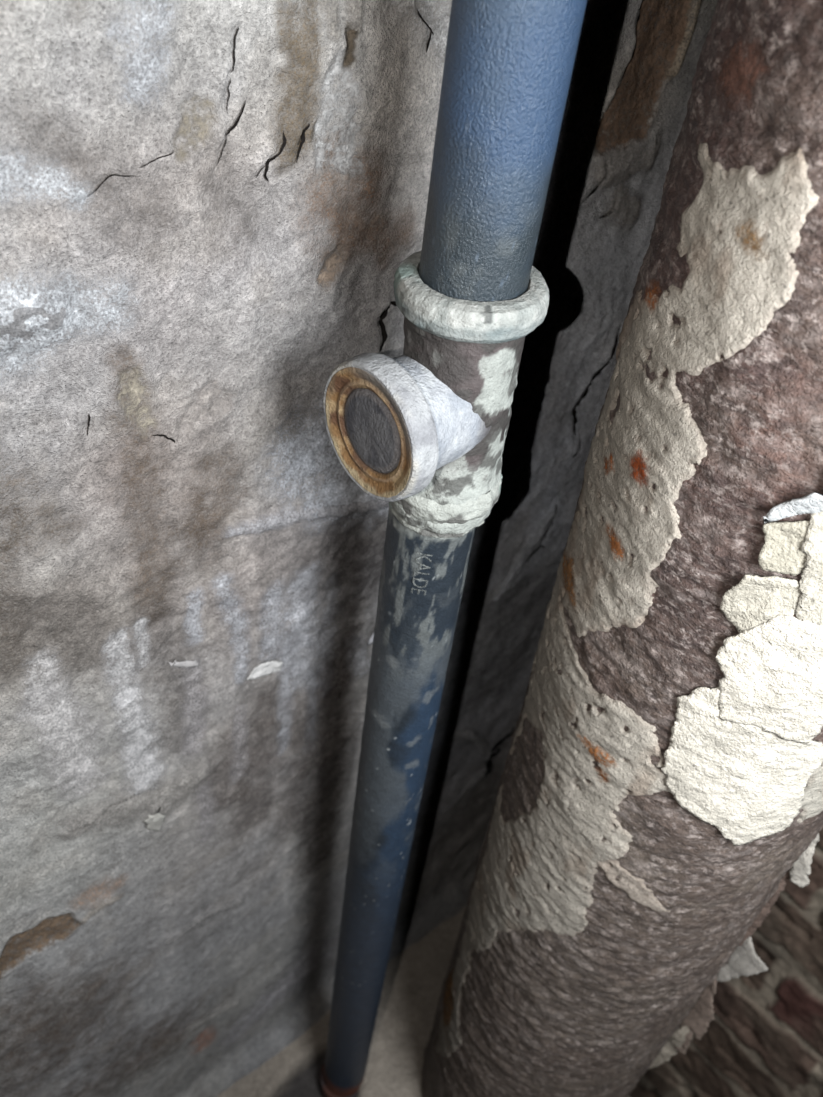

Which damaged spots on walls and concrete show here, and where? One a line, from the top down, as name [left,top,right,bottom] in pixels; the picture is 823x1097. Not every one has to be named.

damp [390,0,449,58]
crack [217,27,246,165]
damp [277,0,320,168]
flaking render [595,0,693,156]
crack [256,124,310,182]
crack [379,301,397,351]
rust [631,454,646,484]
rust [607,526,624,558]
peeling [661,493,823,846]
rust [581,737,615,781]
flaking render [0,913,81,977]
peeling [648,833,820,1069]